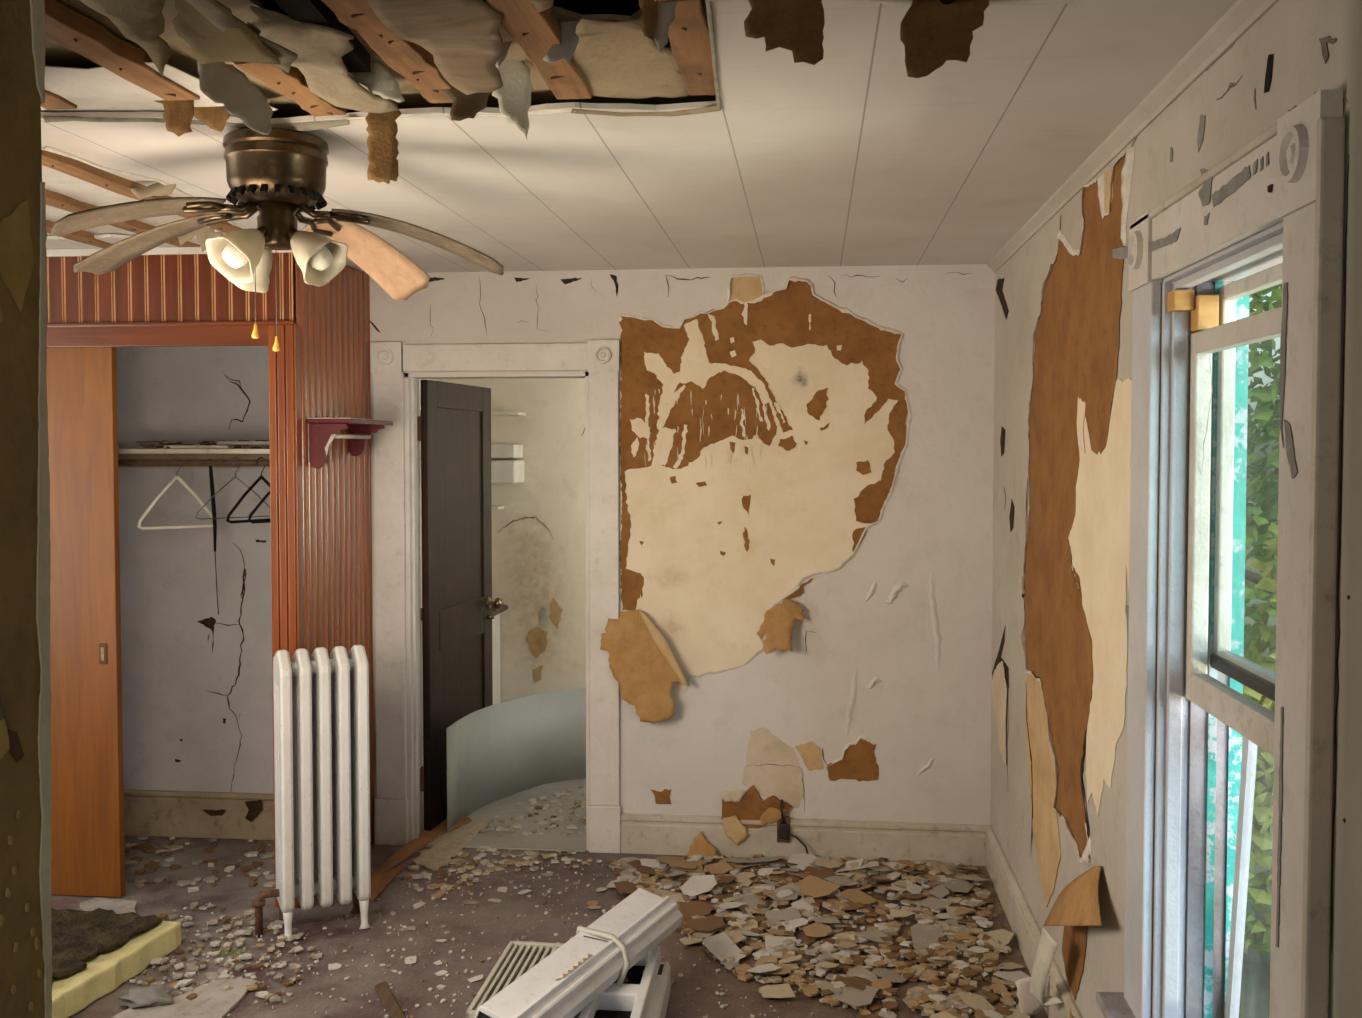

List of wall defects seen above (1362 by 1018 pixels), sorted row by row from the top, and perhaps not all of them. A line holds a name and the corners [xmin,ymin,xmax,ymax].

peeling [30,0,164,112]
peeling [144,62,235,117]
spalling [1264,54,1274,93]
peeling [83,215,185,235]
crack [224,374,251,428]
spalling [0,165,158,1018]
peeling [756,599,804,654]
flaking render [1068,378,1132,817]
crack [203,539,266,821]
peeling [600,610,690,724]
peeling [822,736,879,782]
peeling [687,785,792,860]